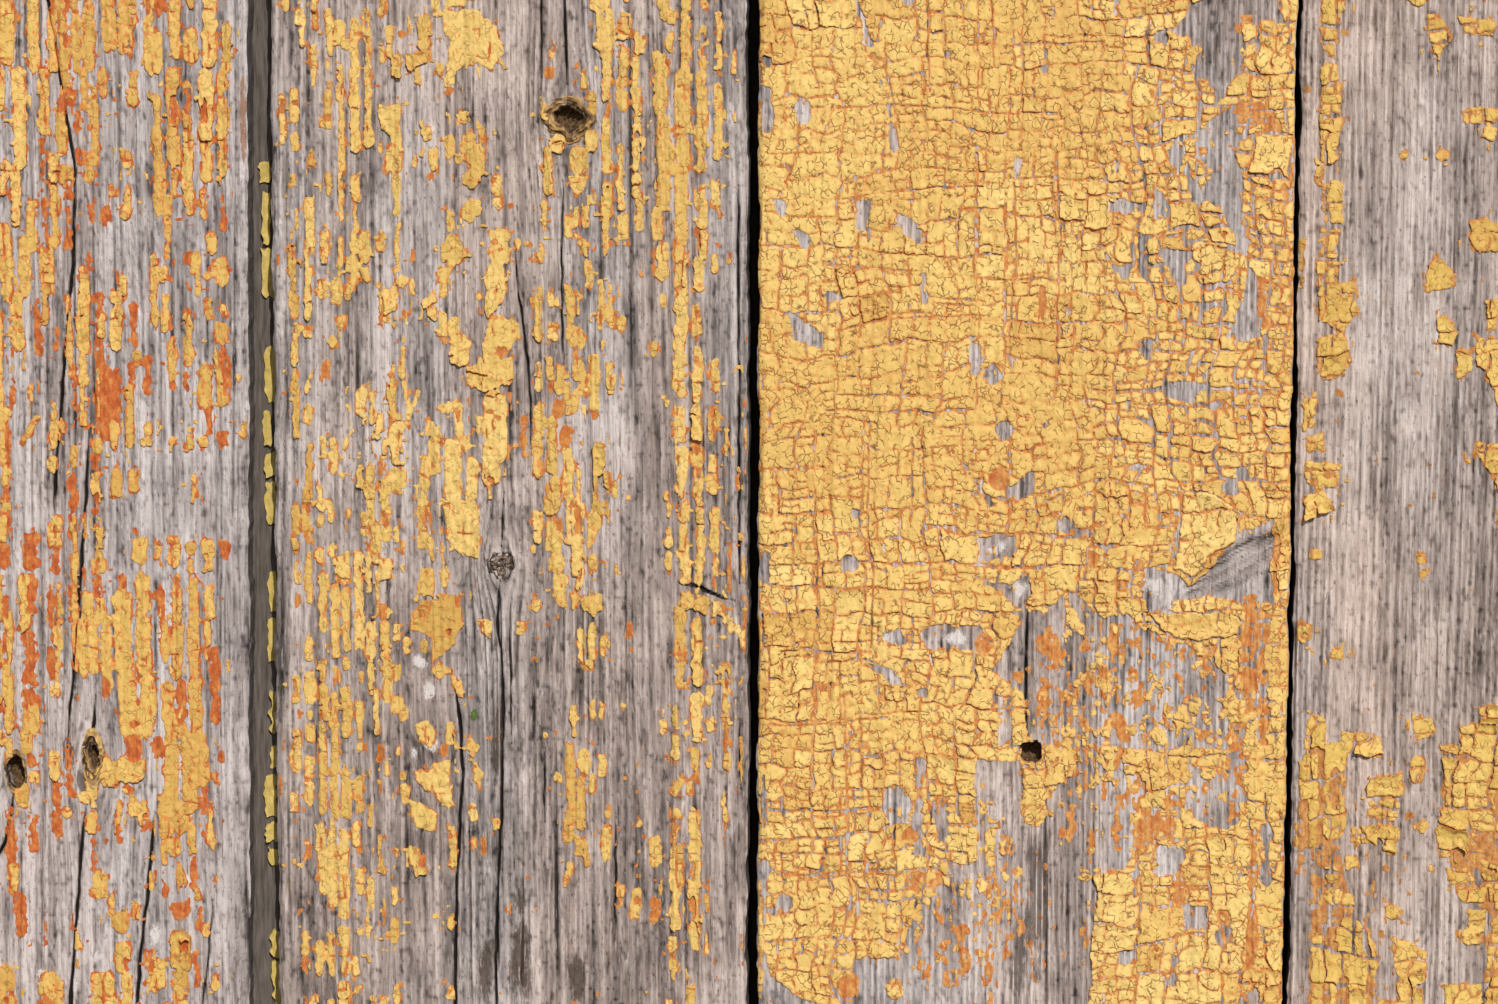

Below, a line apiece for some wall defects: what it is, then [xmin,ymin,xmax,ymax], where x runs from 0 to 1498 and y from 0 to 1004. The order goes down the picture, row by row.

peeling [0,0,248,1004]
crack [1022,614,1030,735]